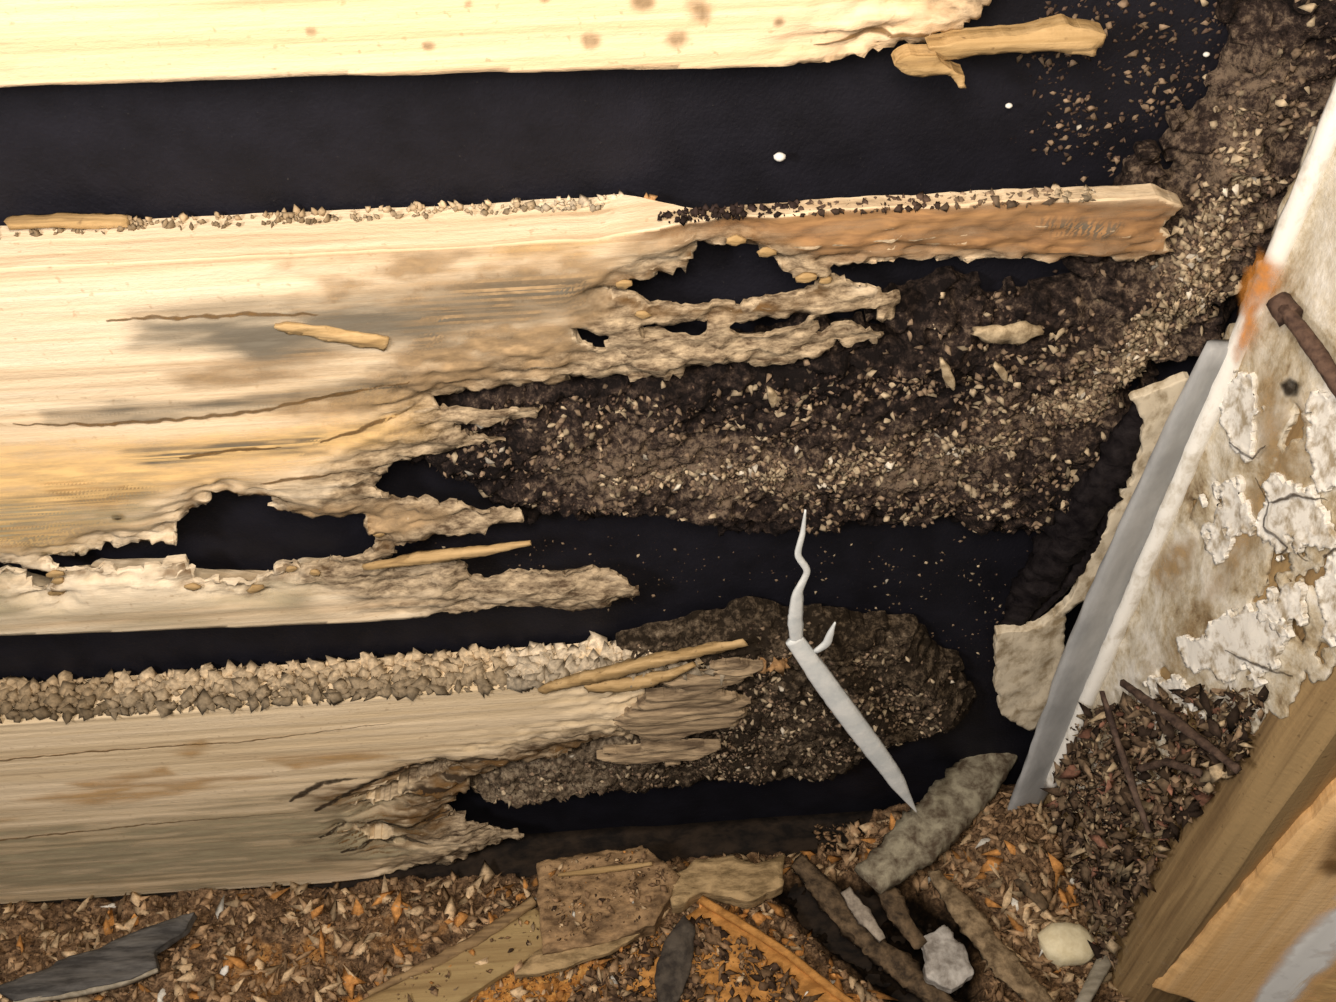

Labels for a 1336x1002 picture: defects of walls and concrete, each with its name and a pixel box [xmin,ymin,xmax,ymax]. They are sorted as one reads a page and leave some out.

peeling [1271,126,1317,238]
corrosion [1238,259,1278,349]
peeling [1058,147,1336,827]
leakage [1228,533,1250,562]
leakage [1250,390,1282,519]
crack [1229,442,1336,584]
crack [1225,650,1293,677]